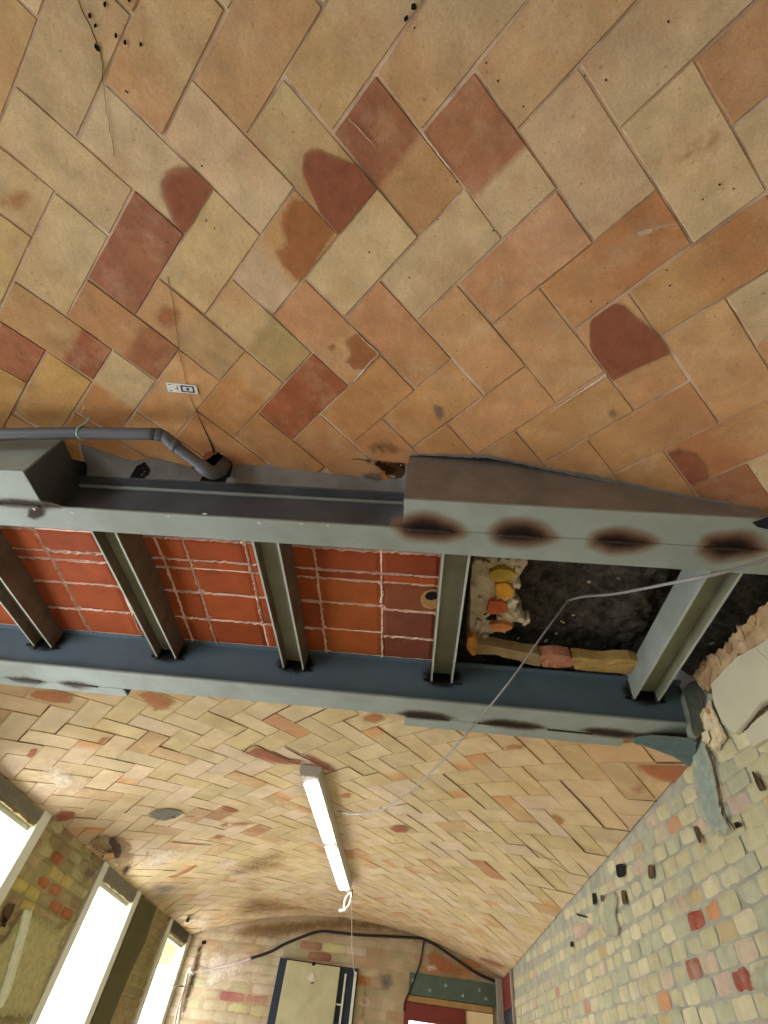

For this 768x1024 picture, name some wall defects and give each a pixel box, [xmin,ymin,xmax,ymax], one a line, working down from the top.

crack [78,1,114,156]
crack [168,280,215,453]
spalling [352,458,408,481]
spalling [466,556,638,674]
spalling [693,602,768,751]
water stain [244,900,291,912]